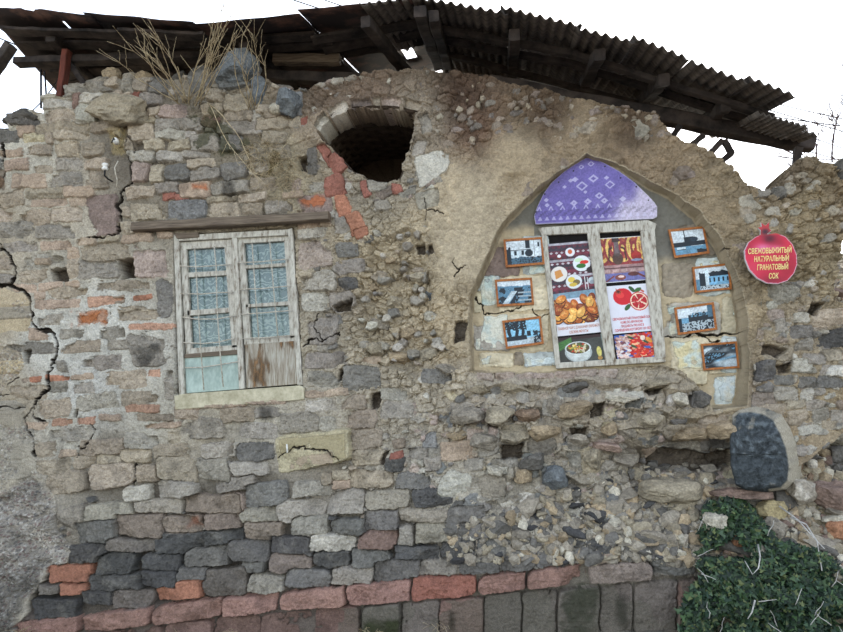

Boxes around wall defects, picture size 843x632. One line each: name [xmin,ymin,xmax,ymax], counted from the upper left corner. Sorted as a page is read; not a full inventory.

crack [87,135,136,239]
crack [0,243,59,424]
crack [279,445,337,458]